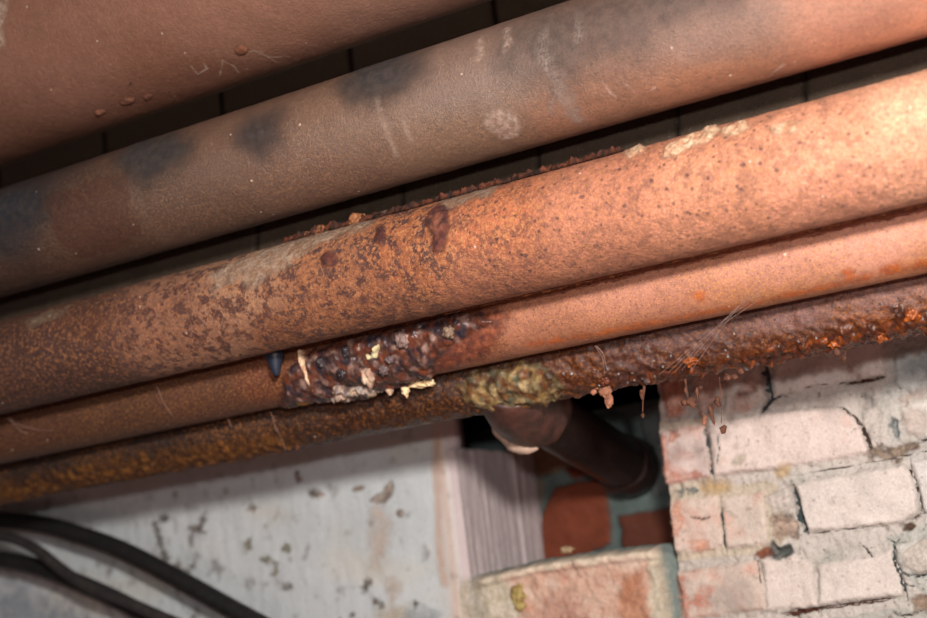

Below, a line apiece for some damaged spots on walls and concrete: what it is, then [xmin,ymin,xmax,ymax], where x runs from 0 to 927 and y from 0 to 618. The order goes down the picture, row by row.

corrosion [282,146,625,252]
efflorescence [212,221,369,288]
corrosion [321,251,337,266]
corrosion [432,204,927,373]
peeling [458,360,563,413]
corrosion [590,304,927,434]